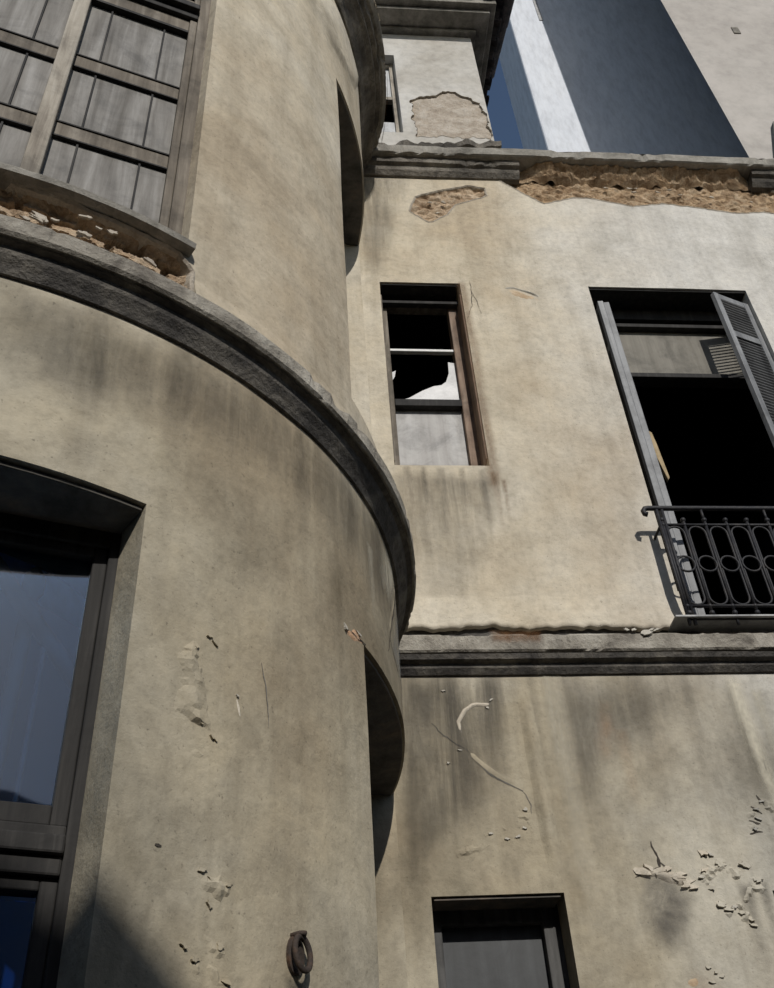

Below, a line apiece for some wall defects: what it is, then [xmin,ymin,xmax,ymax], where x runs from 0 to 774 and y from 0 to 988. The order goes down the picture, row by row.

spalling [409,91,493,139]
spalling [0,183,195,292]
spalling [408,185,488,223]
spalling [498,161,774,214]
crack [388,589,398,671]
flaking render [174,633,218,742]
damp [417,690,474,787]
damp [731,681,774,790]
flaking render [746,795,774,836]
flaking render [633,850,768,927]